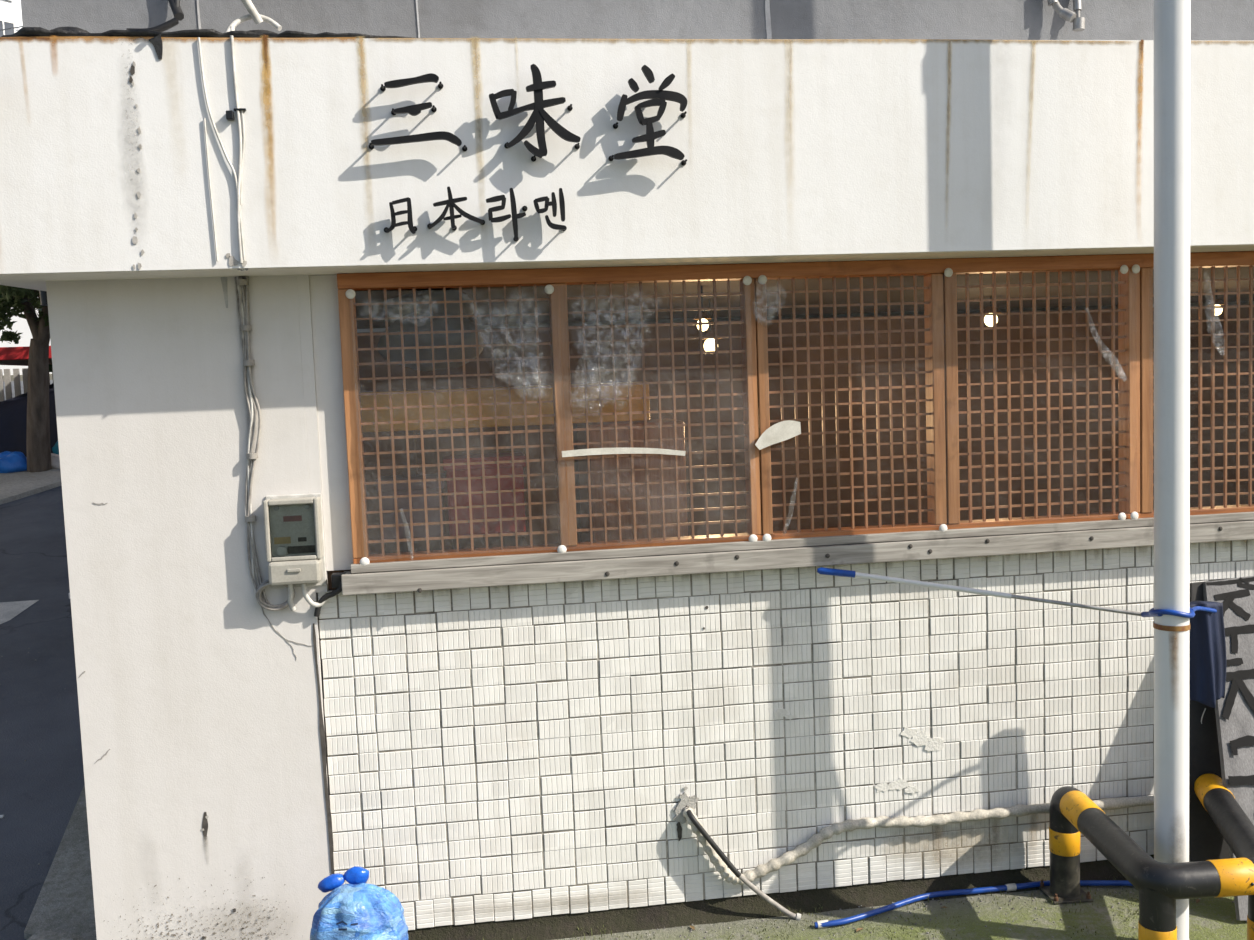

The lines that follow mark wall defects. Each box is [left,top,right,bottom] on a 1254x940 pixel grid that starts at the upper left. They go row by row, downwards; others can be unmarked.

corrosion [0,35,1144,140]
damp [112,868,289,940]